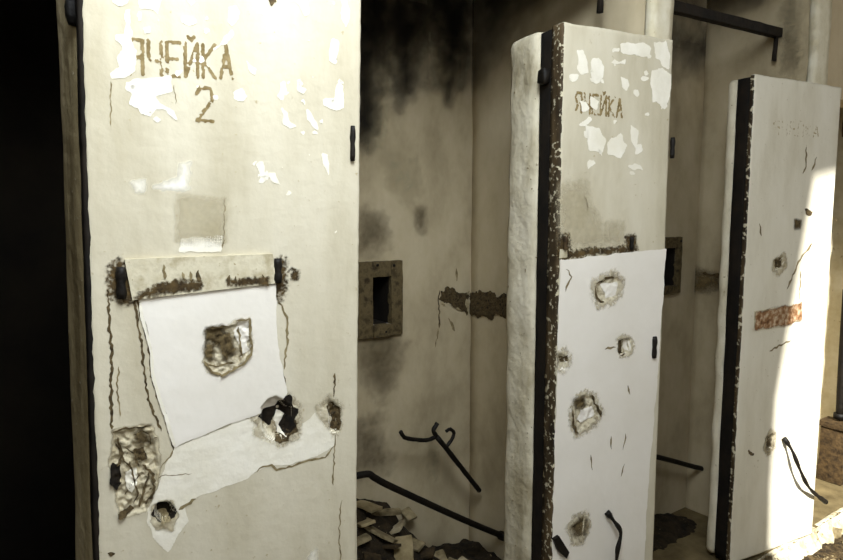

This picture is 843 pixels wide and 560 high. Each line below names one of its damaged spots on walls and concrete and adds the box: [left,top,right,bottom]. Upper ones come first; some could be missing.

peeling [110,0,183,123]
water stain [359,0,533,142]
peeling [569,40,671,109]
peeling [579,96,643,175]
peeling [179,235,223,253]
spalling [439,286,507,320]
spalling [591,270,625,310]
spalling [203,318,253,377]
spalling [606,334,634,358]
spalling [569,392,602,437]
peeling [108,374,342,552]
spalling [567,512,591,546]